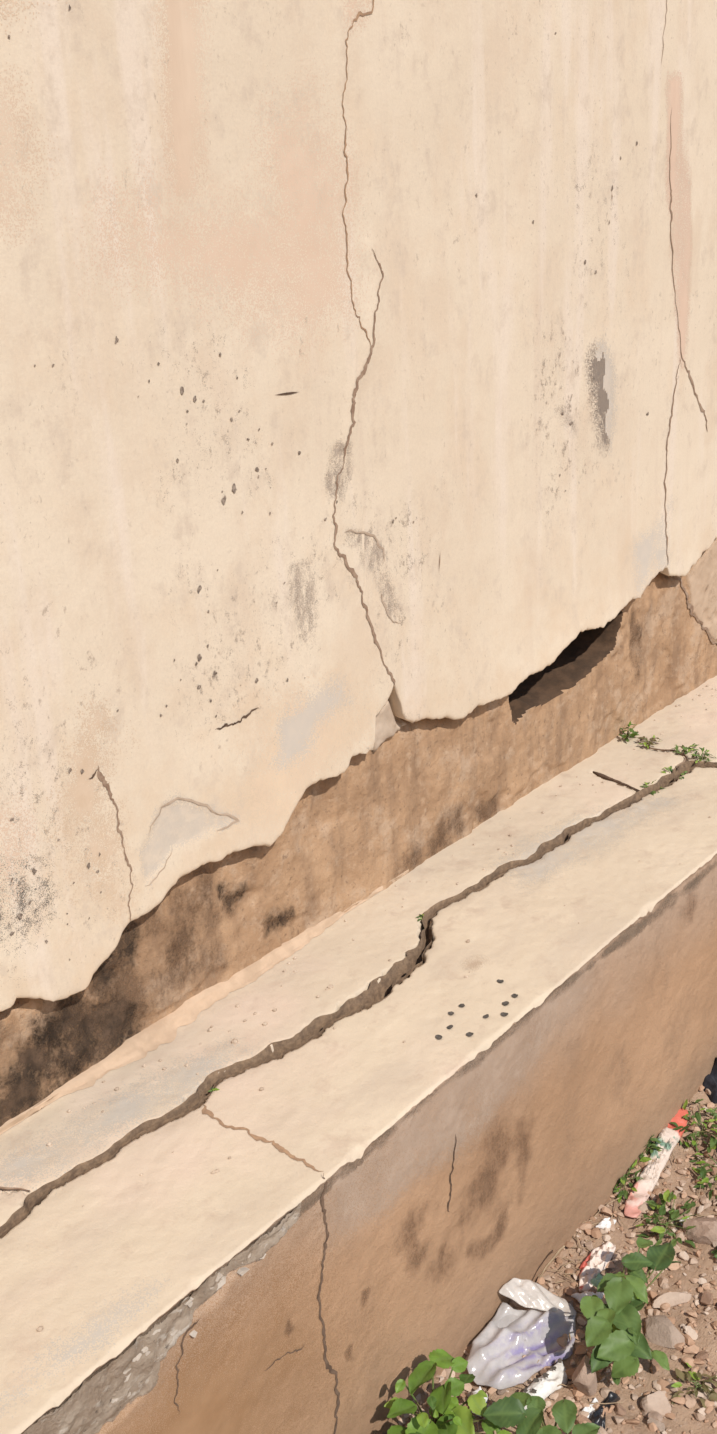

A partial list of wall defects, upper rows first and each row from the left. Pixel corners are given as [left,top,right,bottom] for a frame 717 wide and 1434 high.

crack [332,0,396,685]
crack [659,111,717,644]
water stain [0,694,155,1127]
water stain [0,1032,265,1200]
spalling [23,1203,301,1434]
water stain [160,874,245,985]
flaking render [0,524,717,1124]
crack [0,746,717,1434]